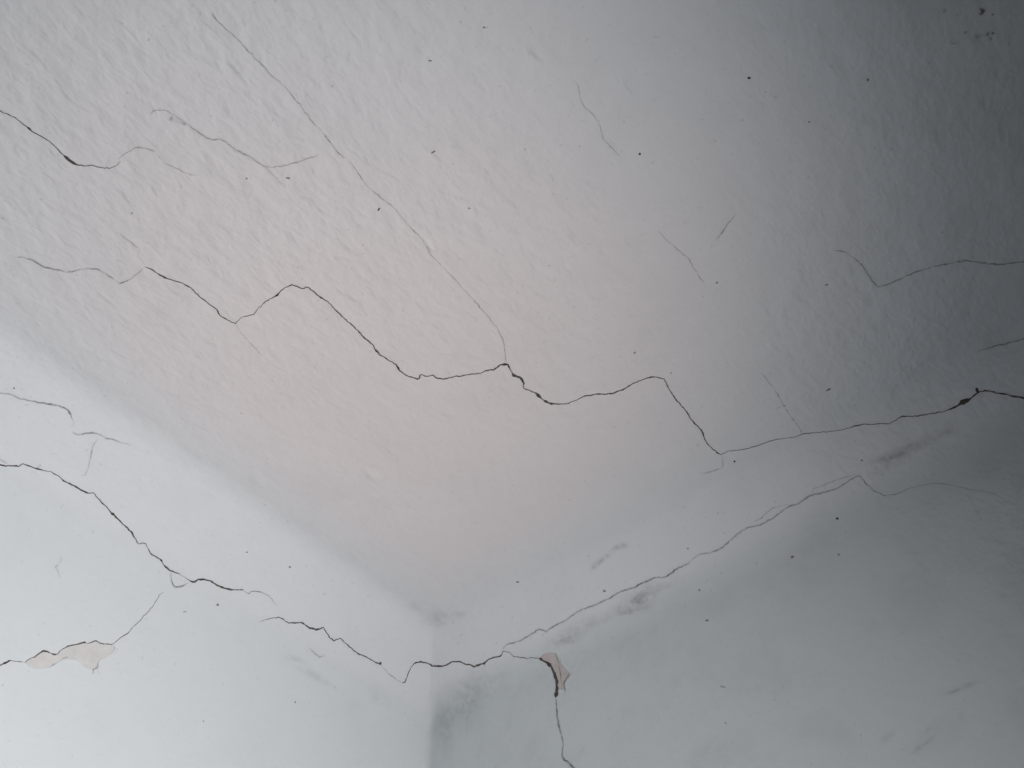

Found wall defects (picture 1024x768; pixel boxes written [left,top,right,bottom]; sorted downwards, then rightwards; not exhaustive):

crack [0,111,121,169]
crack [146,267,1024,455]
crack [0,463,382,666]
peeling [22,642,118,674]
crack [403,624,558,683]
peeling [538,650,573,698]